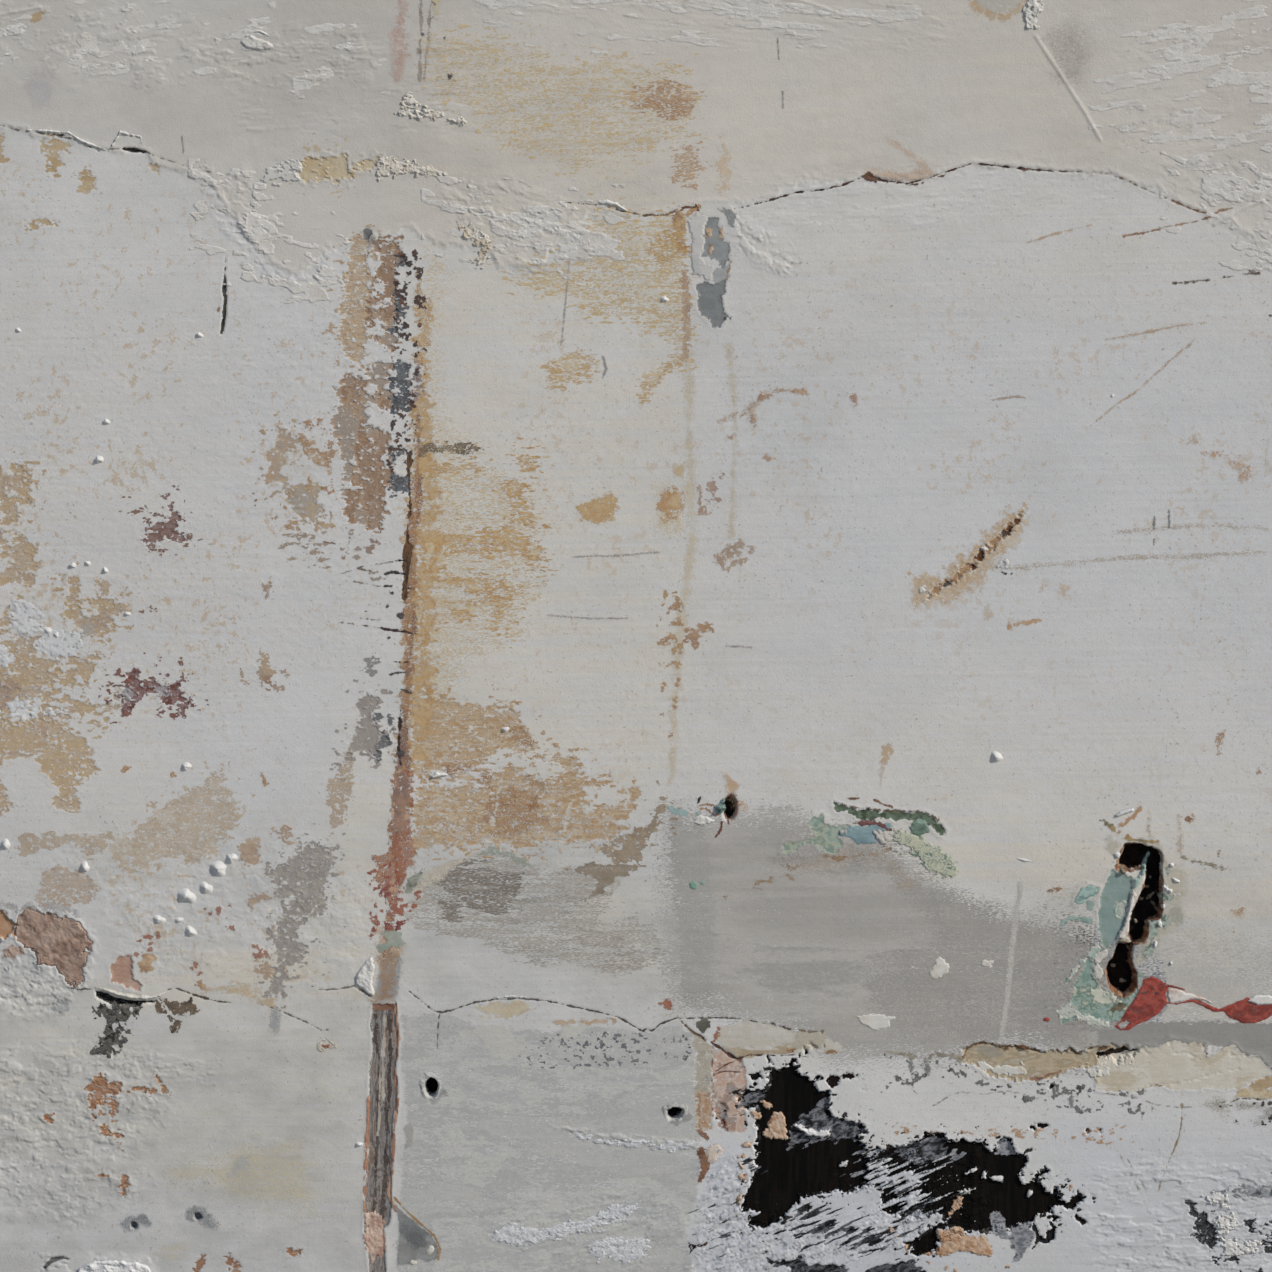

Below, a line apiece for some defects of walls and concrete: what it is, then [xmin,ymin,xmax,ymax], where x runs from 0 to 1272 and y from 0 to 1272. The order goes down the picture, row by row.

crack [3,125,228,175]
crack [734,137,1233,238]
leakage [1172,269,1261,285]
rust [905,501,1035,622]
peeling [0,443,209,814]
rust [367,247,484,1003]
rust [1007,618,1043,631]
peeling [188,134,1272,1272]
peeling [0,753,345,1009]
peeling [84,1070,172,1152]
crack [67,987,231,1007]
crack [409,991,806,1111]